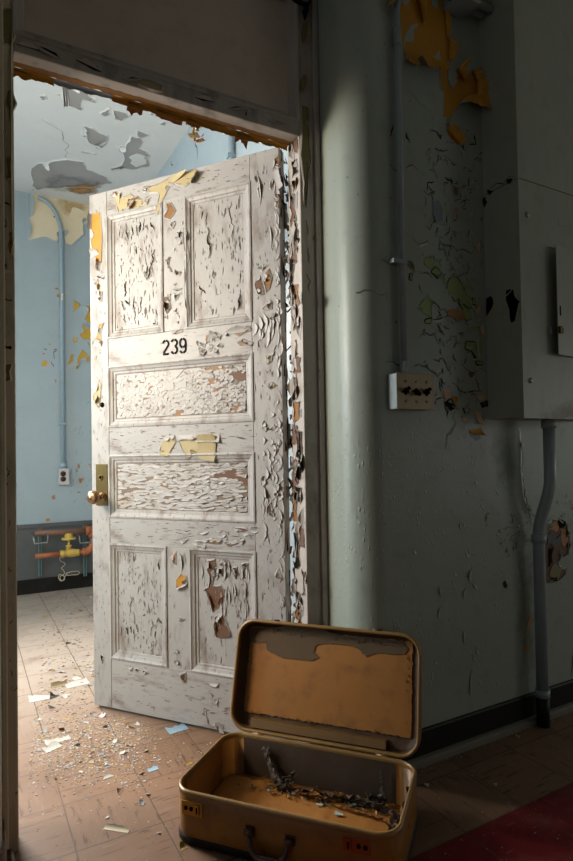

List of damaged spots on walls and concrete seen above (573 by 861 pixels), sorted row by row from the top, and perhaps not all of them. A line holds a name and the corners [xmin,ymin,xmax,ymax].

peeling [386,0,491,145]
peeling [3,8,315,623]
peeling [407,257,495,377]
peeling [443,389,490,441]
peeling [201,559,250,638]
spalling [545,500,573,584]